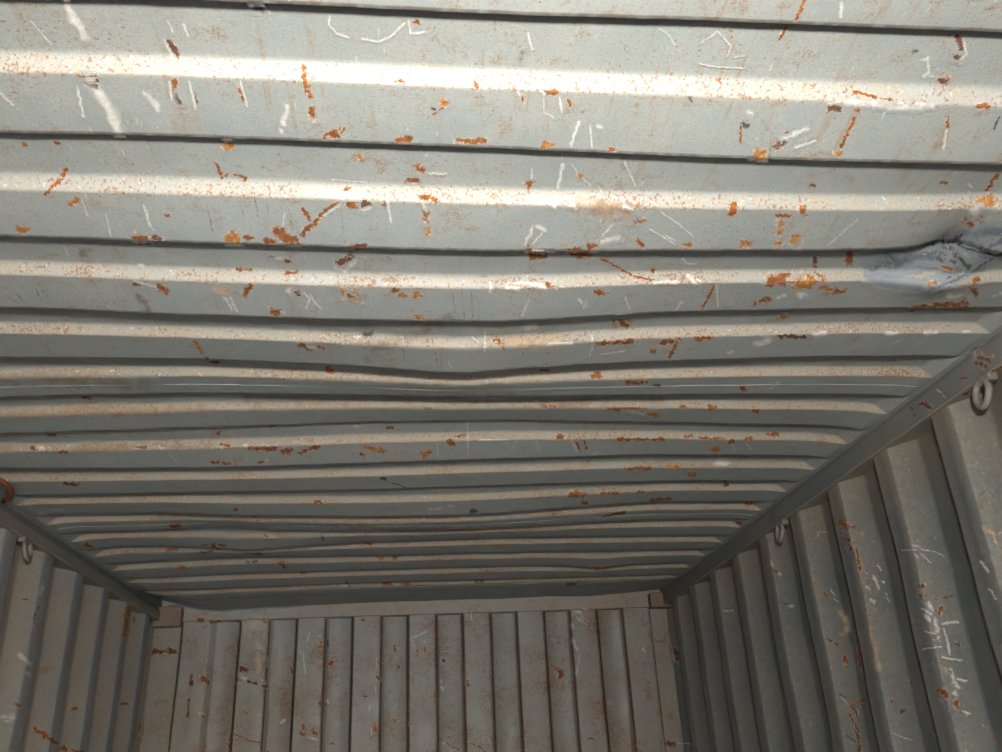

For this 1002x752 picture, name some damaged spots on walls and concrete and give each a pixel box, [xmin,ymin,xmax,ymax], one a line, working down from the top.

rust [934,34,969,91]
rust [831,87,953,160]
rust [42,165,84,210]
rust [233,266,259,304]
rust [205,183,380,255]
rust [335,282,366,309]
rust [736,237,756,250]
rust [748,202,850,342]
rust [604,405,663,421]
rust [681,430,781,455]
rust [195,615,272,752]
rust [288,617,356,752]